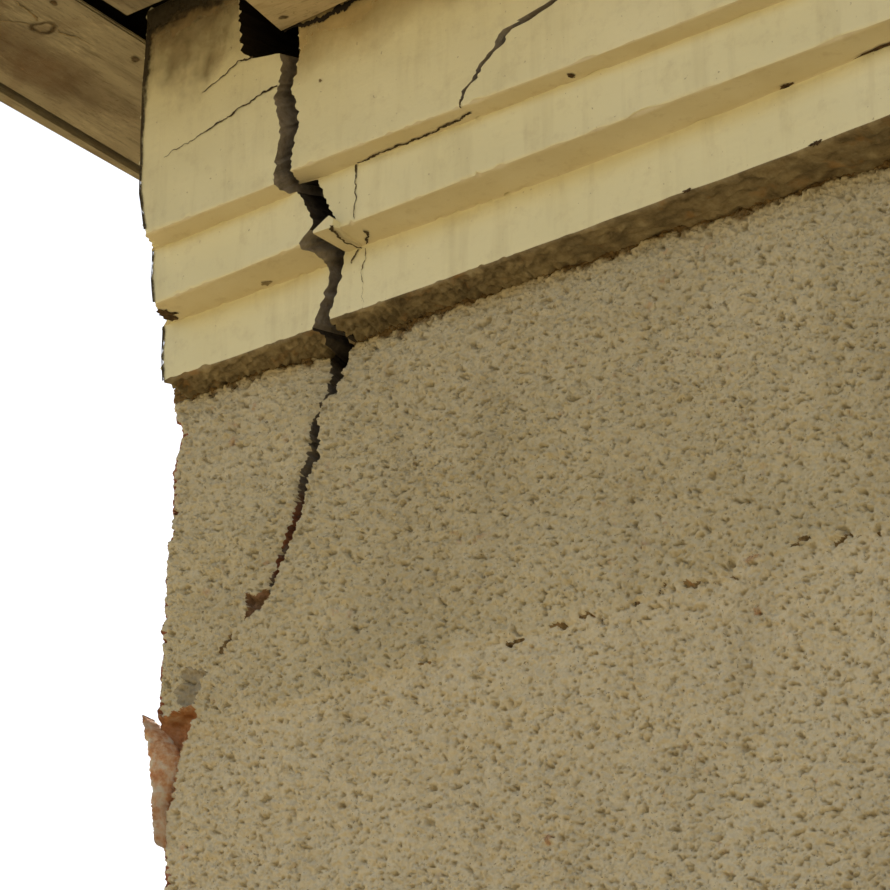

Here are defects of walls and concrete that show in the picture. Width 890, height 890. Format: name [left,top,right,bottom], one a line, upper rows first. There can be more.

crack [165,0,557,654]
spalling [172,417,188,515]
spalling [142,655,208,888]